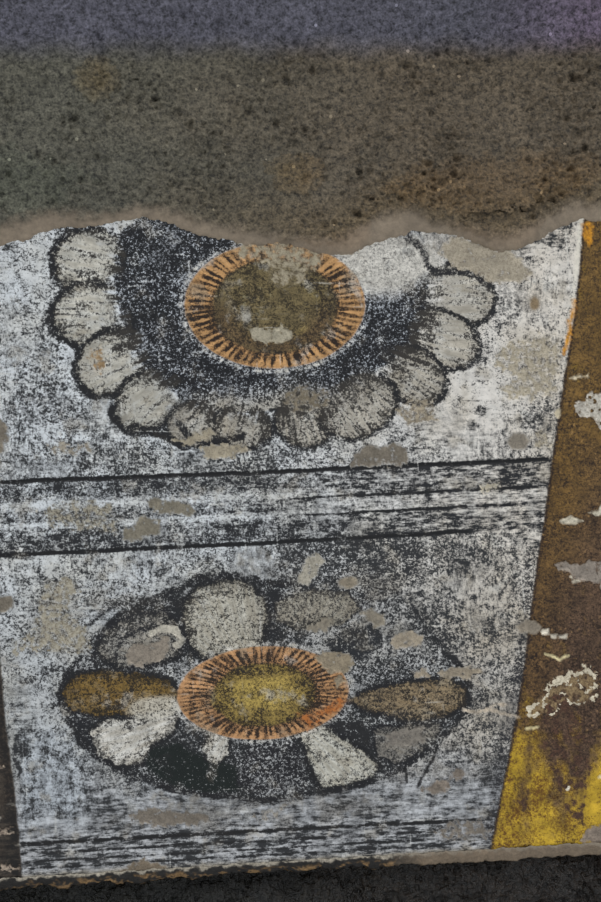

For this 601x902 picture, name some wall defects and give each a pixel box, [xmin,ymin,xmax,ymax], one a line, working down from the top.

peeling [490,330,590,419]
flaking render [574,390,601,430]
peeling [506,428,554,451]
peeling [554,559,601,590]
peeling [524,652,600,731]